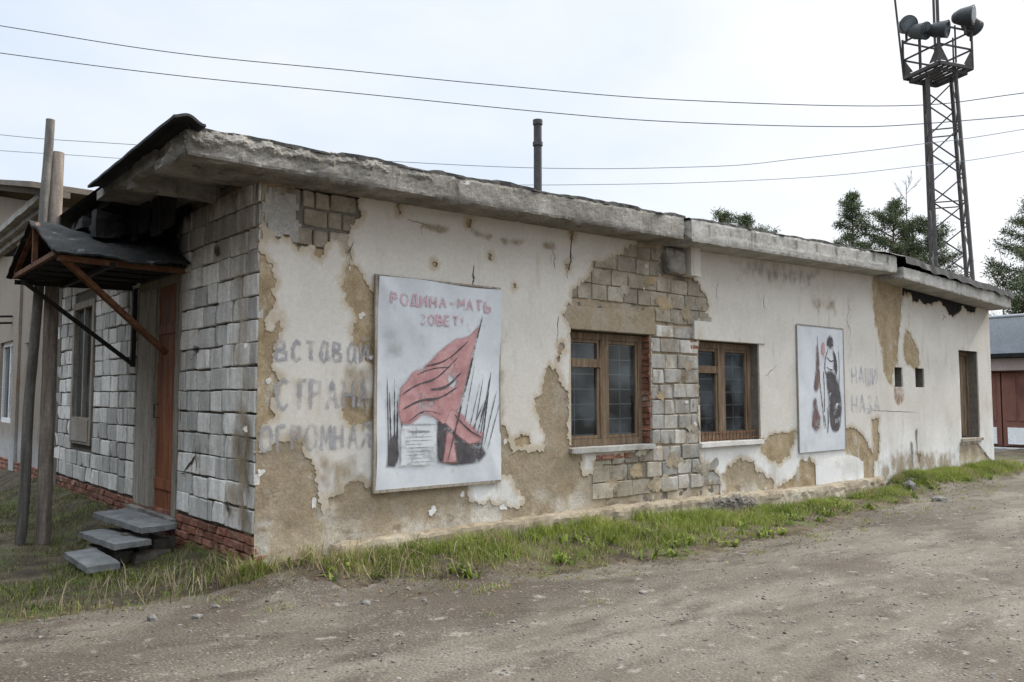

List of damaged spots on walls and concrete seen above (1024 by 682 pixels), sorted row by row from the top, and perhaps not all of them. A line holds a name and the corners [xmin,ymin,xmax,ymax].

peeling [872,275,976,384]
peeling [243,253,631,566]
peeling [699,430,816,513]
peeling [845,418,879,478]